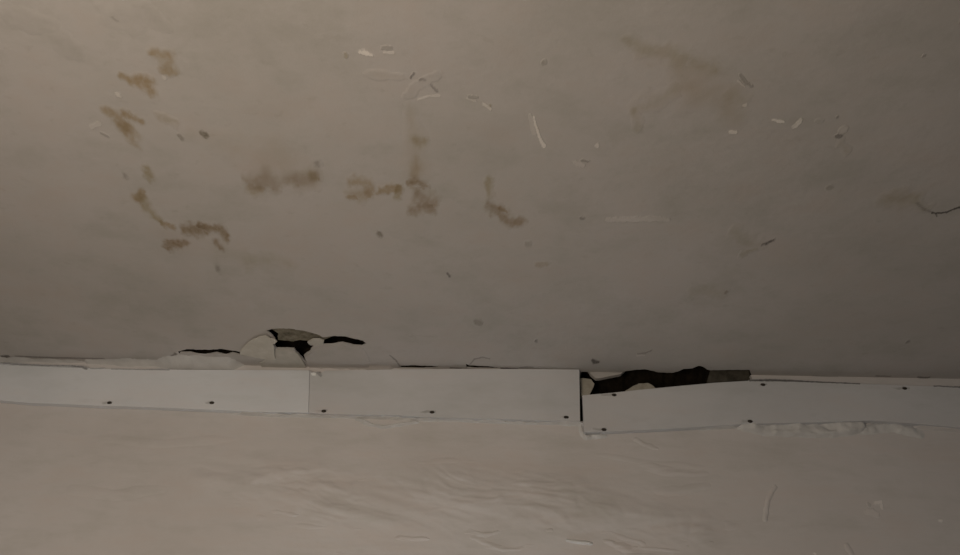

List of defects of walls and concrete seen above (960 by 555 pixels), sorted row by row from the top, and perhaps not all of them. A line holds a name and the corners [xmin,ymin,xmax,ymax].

water stain [98,45,325,278]
water stain [342,100,443,219]
water stain [482,174,529,231]
crack [929,205,960,217]
flaking render [240,328,393,378]
flaking render [579,366,751,421]